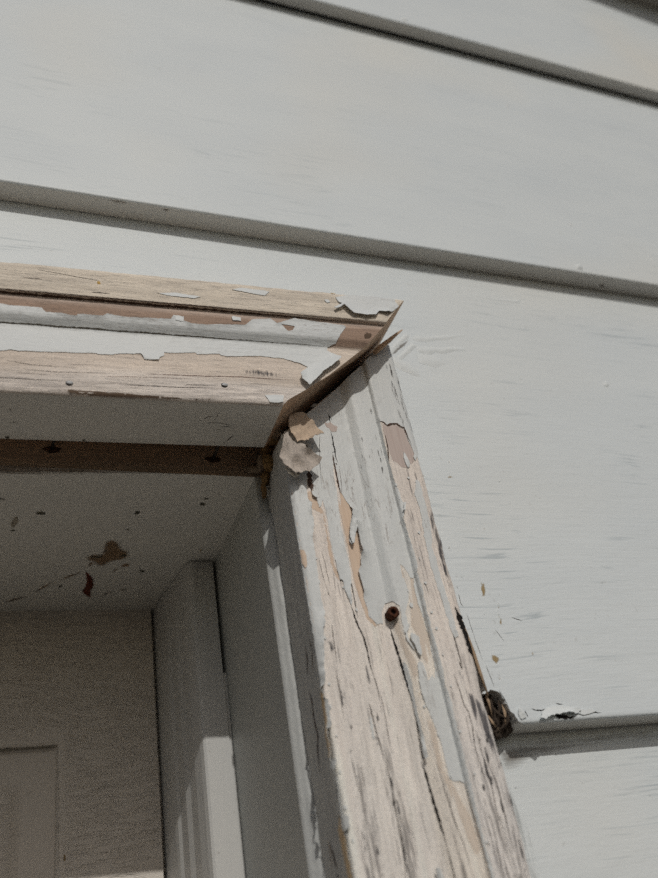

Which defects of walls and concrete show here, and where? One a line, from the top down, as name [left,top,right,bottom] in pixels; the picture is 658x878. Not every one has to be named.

peeling [335,295,399,315]
peeling [0,303,346,385]
peeling [265,395,284,403]
peeling [279,345,494,878]
peeling [540,705,595,719]